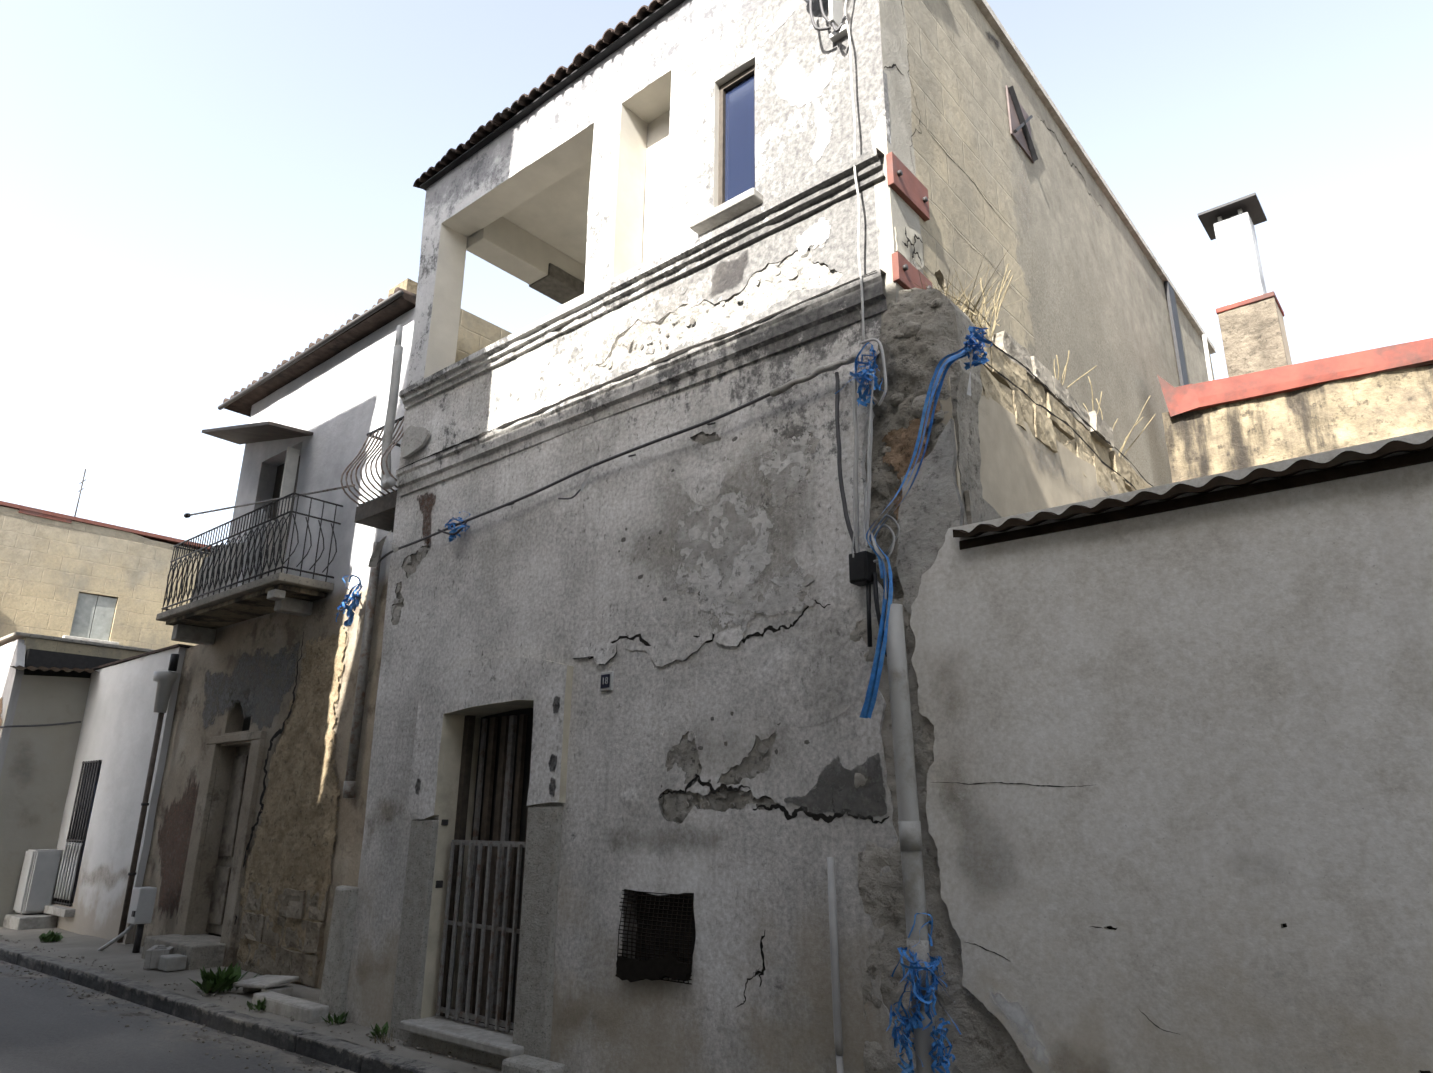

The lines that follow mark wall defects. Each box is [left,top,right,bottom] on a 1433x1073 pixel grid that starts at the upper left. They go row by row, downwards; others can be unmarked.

crack [1040,120,1110,222]
spalling [865,288,1033,1073]
spalling [659,711,798,823]
crack [934,780,1091,788]
spalling [850,617,917,1073]
crack [735,931,766,1008]